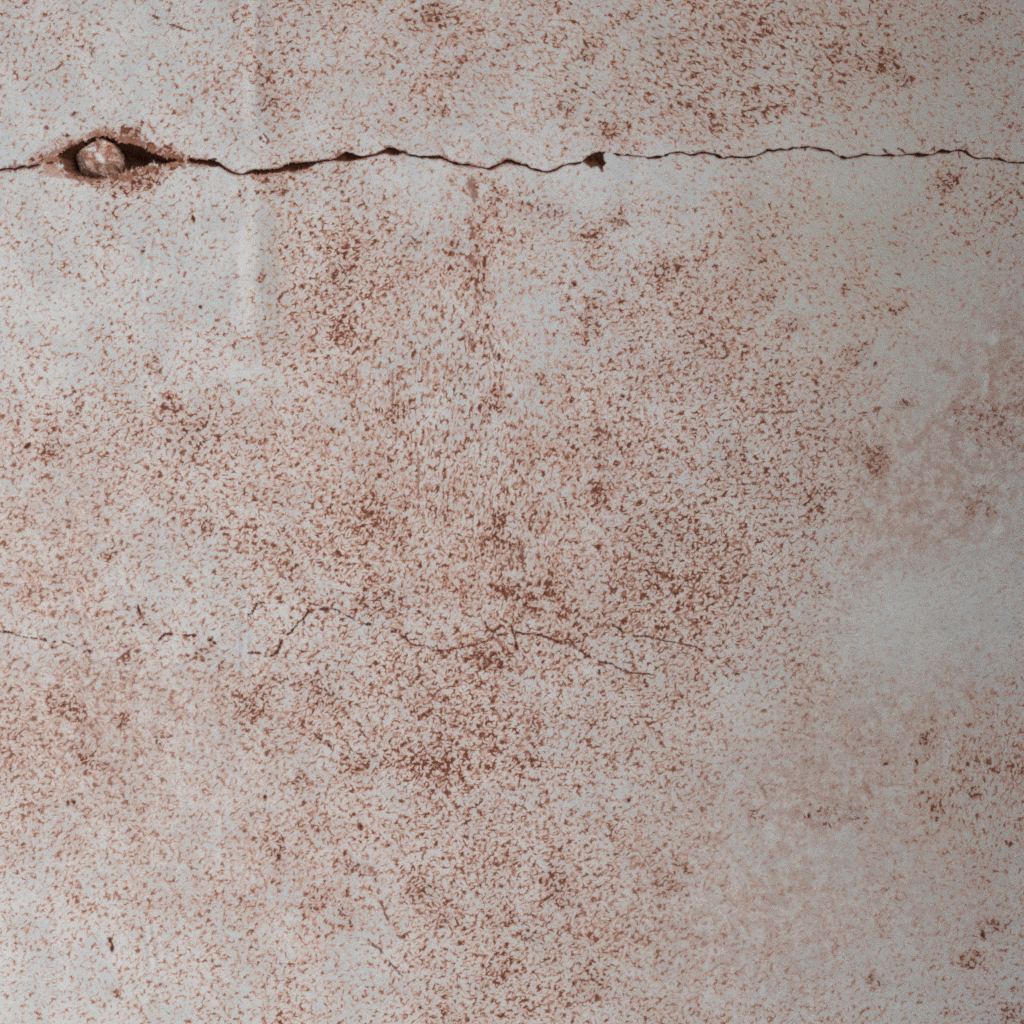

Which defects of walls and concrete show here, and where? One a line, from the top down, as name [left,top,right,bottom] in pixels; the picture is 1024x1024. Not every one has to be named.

crack [0,159,53,175]
hole [23,117,202,202]
crack [187,144,582,181]
crack [613,142,1024,166]
corrosion [388,147,634,431]
corrosion [337,342,456,560]
corrosion [486,491,565,629]
crack [0,604,225,655]
crack [246,600,741,677]
corrosion [179,632,356,739]
corrosion [332,734,482,797]
corrosion [260,819,376,943]